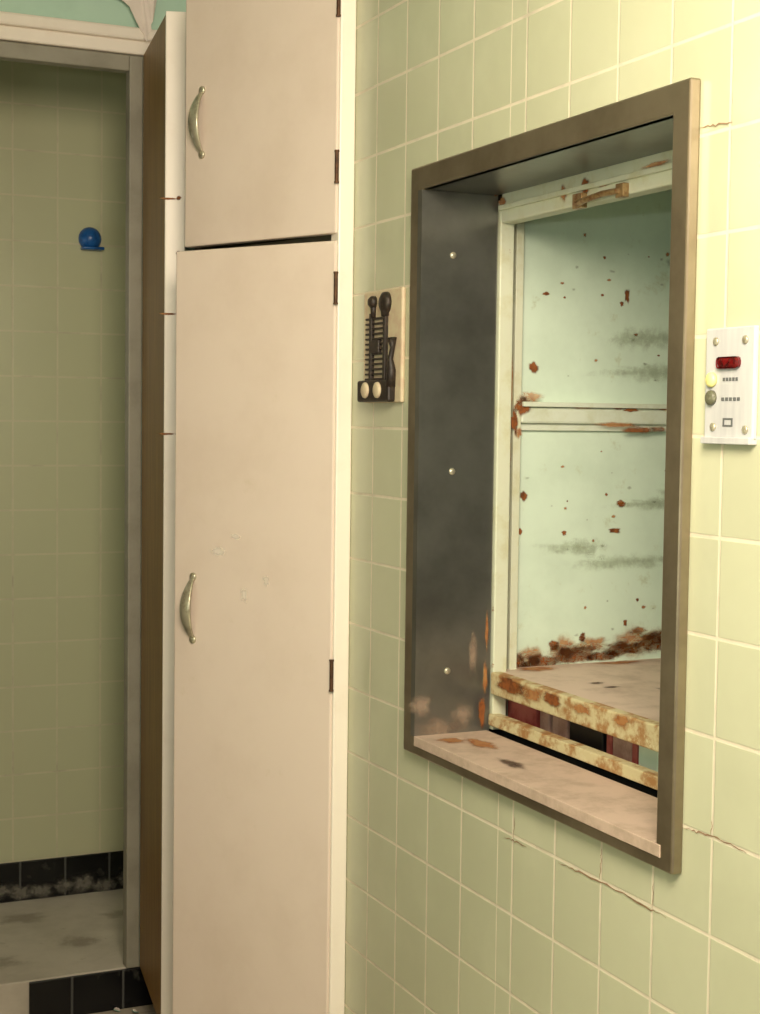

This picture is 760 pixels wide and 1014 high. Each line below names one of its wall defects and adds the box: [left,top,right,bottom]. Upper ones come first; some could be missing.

peeling [122,0,157,42]
corrosion [510,367,540,461]
corrosion [601,408,665,433]
corrosion [516,620,661,667]
corrosion [478,665,560,727]
corrosion [614,715,628,726]
corrosion [440,738,495,748]
crack [684,821,746,853]
crack [561,849,666,918]